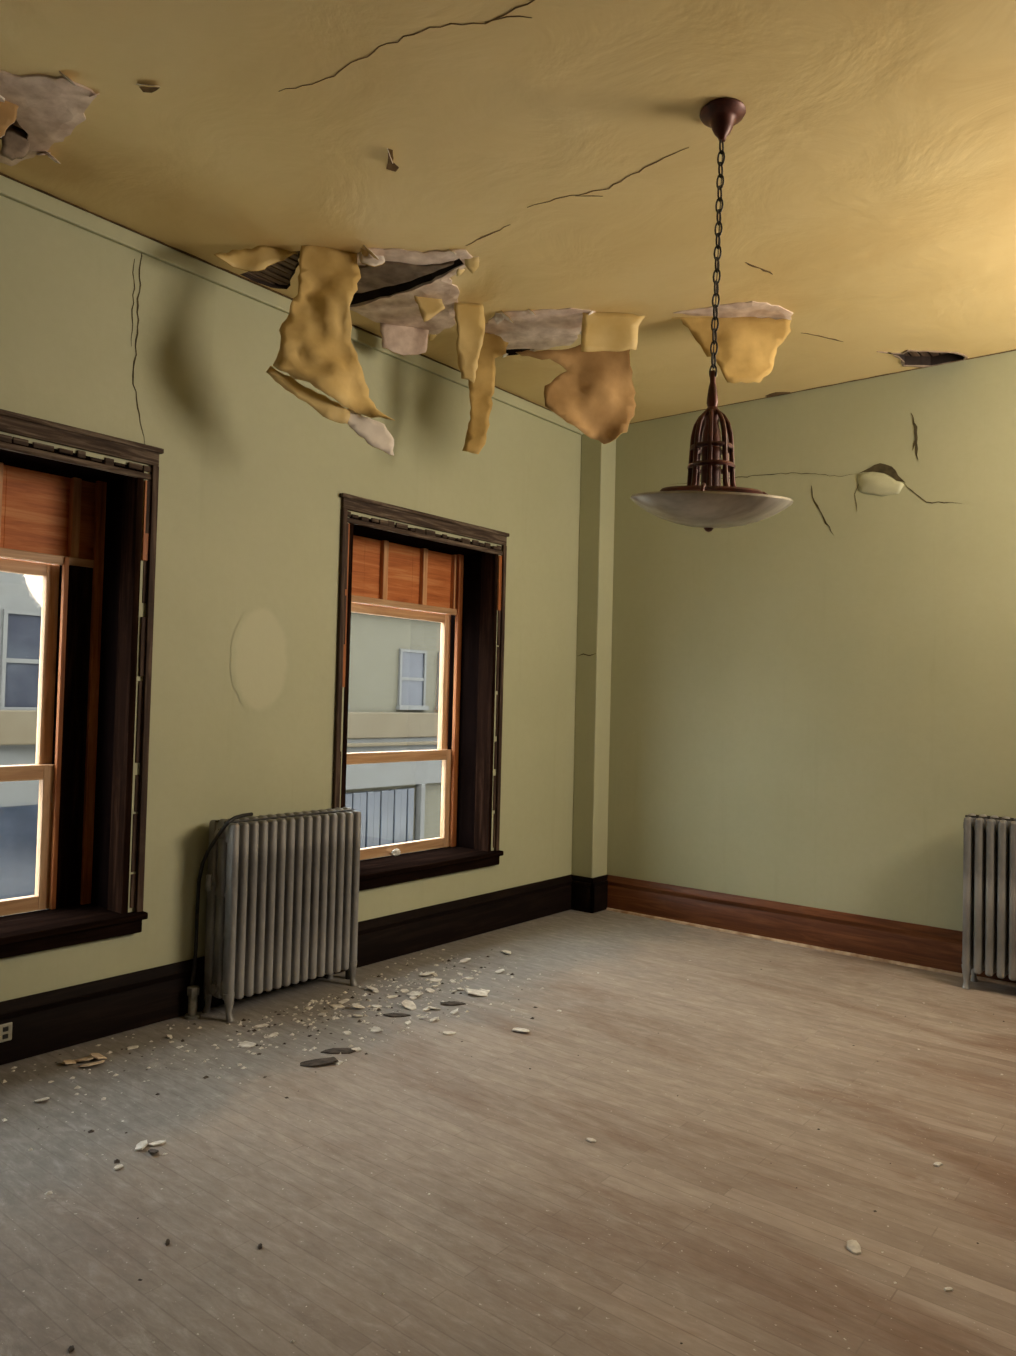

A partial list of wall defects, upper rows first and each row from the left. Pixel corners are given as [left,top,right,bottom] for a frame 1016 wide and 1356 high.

crack [280,0,535,91]
flaking render [0,70,99,166]
crack [466,147,689,246]
crack [131,253,145,444]
flaking render [214,245,645,456]
flaking render [672,301,793,397]
flaking render [877,350,968,368]
crack [721,472,859,534]
crack [905,413,961,504]